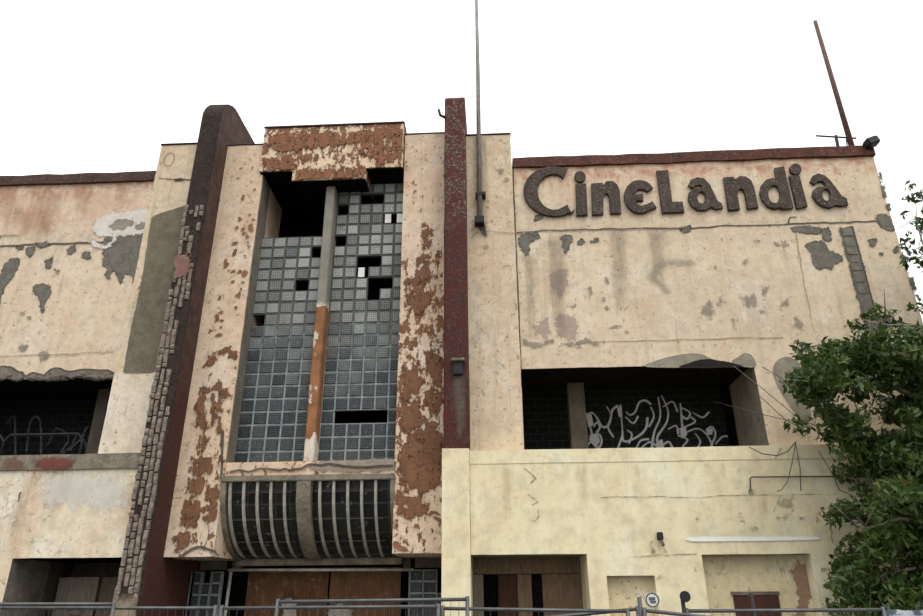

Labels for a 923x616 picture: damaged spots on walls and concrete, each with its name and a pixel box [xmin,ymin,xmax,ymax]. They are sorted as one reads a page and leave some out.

peeling [262,127,403,179]
peeling [92,207,149,237]
spalling [875,172,895,231]
peeling [0,241,50,303]
peeling [32,283,51,313]
peeling [223,213,255,309]
peeling [404,222,442,315]
spalling [790,225,878,334]
spalling [868,238,920,299]
spalling [0,351,115,382]
peeling [204,345,238,366]
peeling [171,379,233,560]